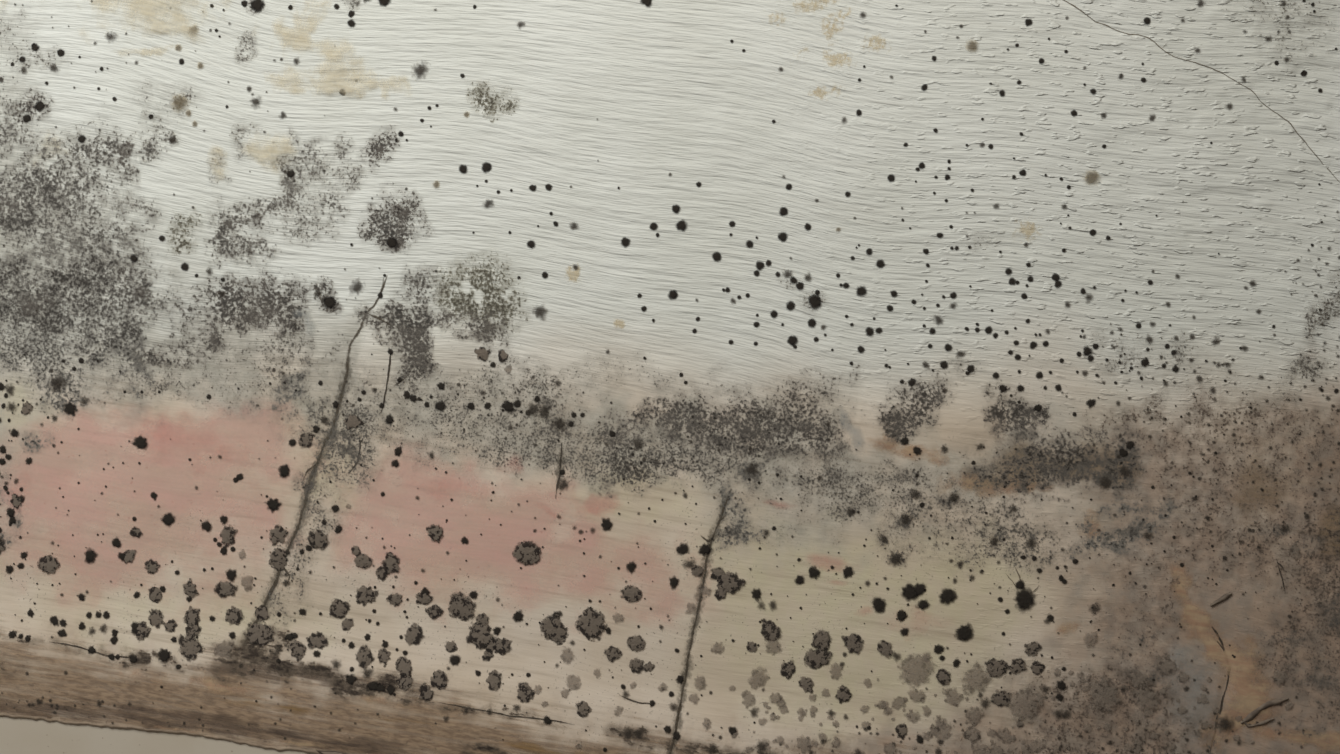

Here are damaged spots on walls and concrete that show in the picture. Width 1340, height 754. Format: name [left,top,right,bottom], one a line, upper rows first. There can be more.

mould [241,0,265,13]
mould [334,0,390,27]
crack [1064,0,1336,178]
mould [350,183,430,253]
water stain [459,162,512,207]
water stain [672,205,686,231]
water stain [746,236,834,351]
water stain [836,273,866,295]
mould [1005,263,1033,299]
crack [243,277,407,646]
mould [334,575,408,655]
crack [668,490,731,754]